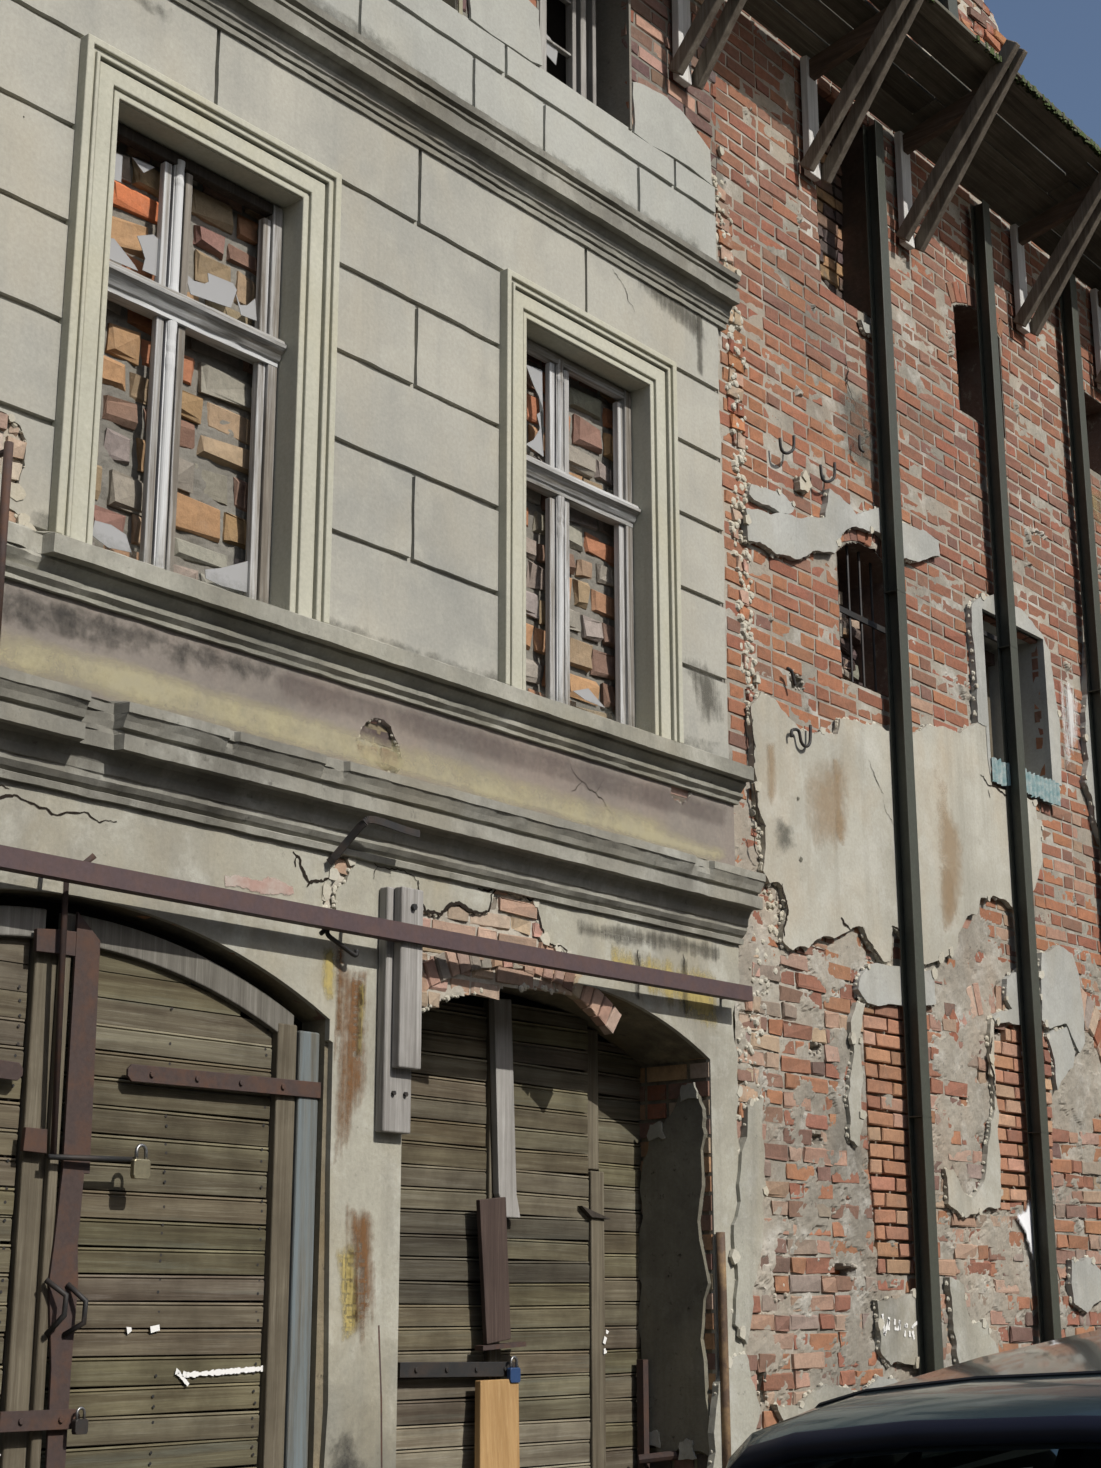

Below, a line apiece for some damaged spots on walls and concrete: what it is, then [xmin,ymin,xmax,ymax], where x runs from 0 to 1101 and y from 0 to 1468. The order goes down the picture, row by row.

peeling [902,521,940,564]
crack [0,785,117,823]
corrosion [336,947,365,1136]
flaking render [423,890,572,954]
flaking render [422,947,621,1035]
peeling [637,306,920,1468]
peeling [913,593,1013,1007]
peeling [941,968,1020,1219]
peeling [1015,606,1062,800]
peeling [1037,944,1092,1091]
peeling [1080,642,1099,845]
corrosion [351,1213,372,1329]